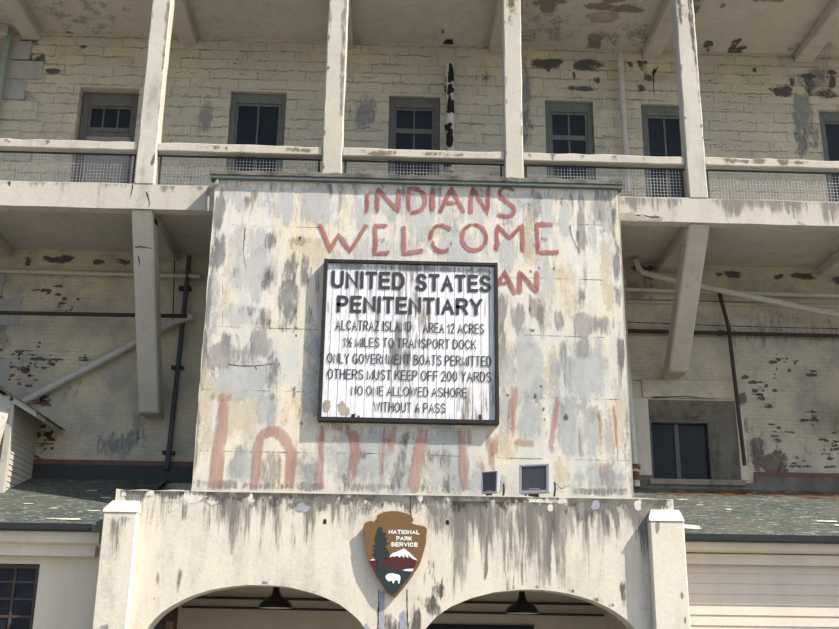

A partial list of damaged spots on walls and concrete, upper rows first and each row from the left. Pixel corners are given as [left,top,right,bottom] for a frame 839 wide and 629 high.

peeling [583,0,644,23]
damp [522,57,532,139]
peeling [531,58,604,92]
peeling [769,70,838,100]
damp [793,70,830,157]
peeling [43,255,74,264]
damp [200,190,280,401]
peeling [0,342,63,388]
peeling [739,354,798,408]
peeling [750,423,812,472]
damp [120,434,668,584]
damp [384,579,444,629]